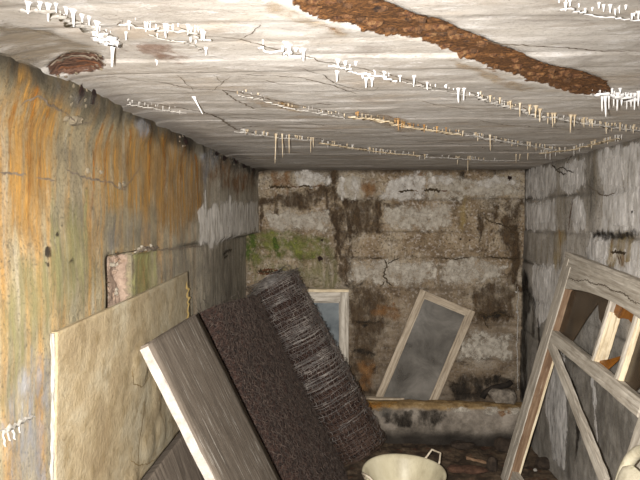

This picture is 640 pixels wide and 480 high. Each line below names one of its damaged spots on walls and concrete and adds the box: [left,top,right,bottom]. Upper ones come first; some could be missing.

corrosion [9,75,66,235]
spalling [47,51,106,78]
water stain [0,0,212,67]
corrosion [104,124,247,232]
crack [119,75,573,175]
crack [118,18,596,131]
water stain [237,59,640,178]
crack [480,39,622,52]
water stain [558,0,640,21]
water stain [258,170,400,394]
crack [366,257,399,287]
water stain [450,201,540,400]